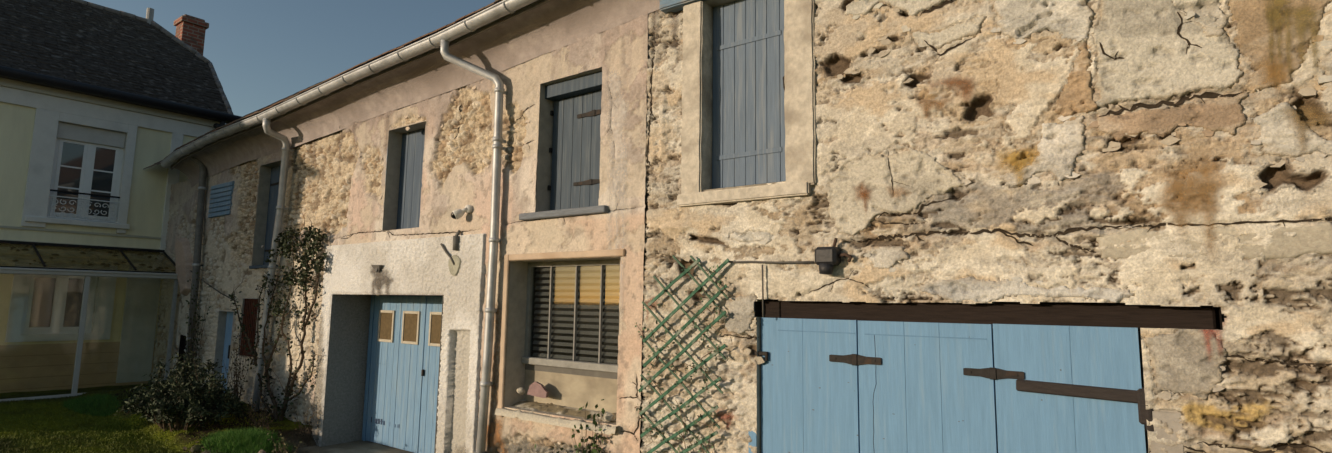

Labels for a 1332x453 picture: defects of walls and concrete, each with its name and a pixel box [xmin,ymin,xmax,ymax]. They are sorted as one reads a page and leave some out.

crack [1177,12,1202,53]
flaking render [281,128,387,245]
flaking render [388,84,530,192]
crack [607,11,657,239]
rust [1003,151,1035,180]
peeling [844,0,1332,188]
rust [1164,165,1215,222]